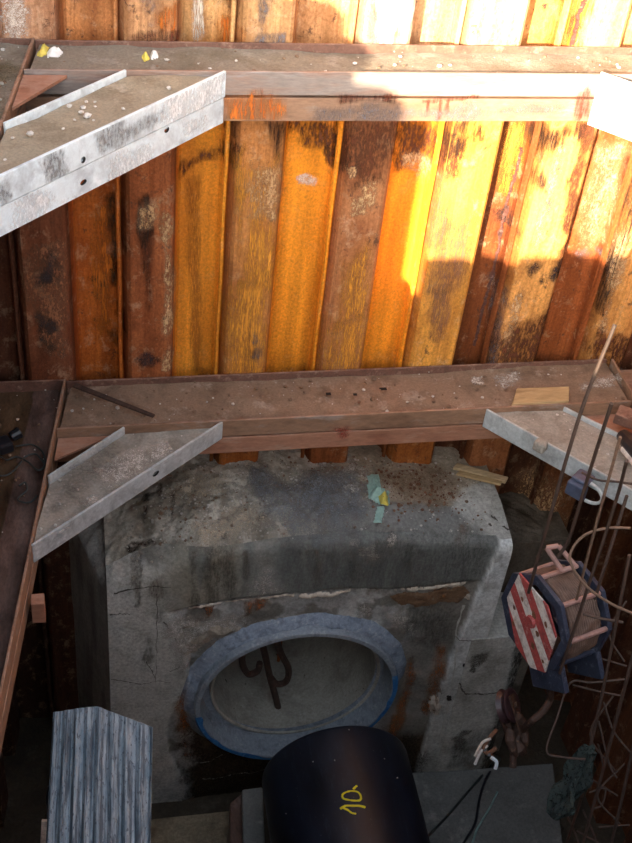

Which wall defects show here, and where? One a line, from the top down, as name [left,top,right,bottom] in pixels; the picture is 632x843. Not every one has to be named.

corrosion [545,0,594,47]
corrosion [225,92,284,120]
corrosion [106,191,127,286]
corrosion [136,194,154,276]
corrosion [179,141,277,374]
corrosion [288,95,484,341]
corrosion [473,122,525,346]
corrosion [316,247,371,370]
crack [110,586,183,684]
spalling [390,582,470,607]